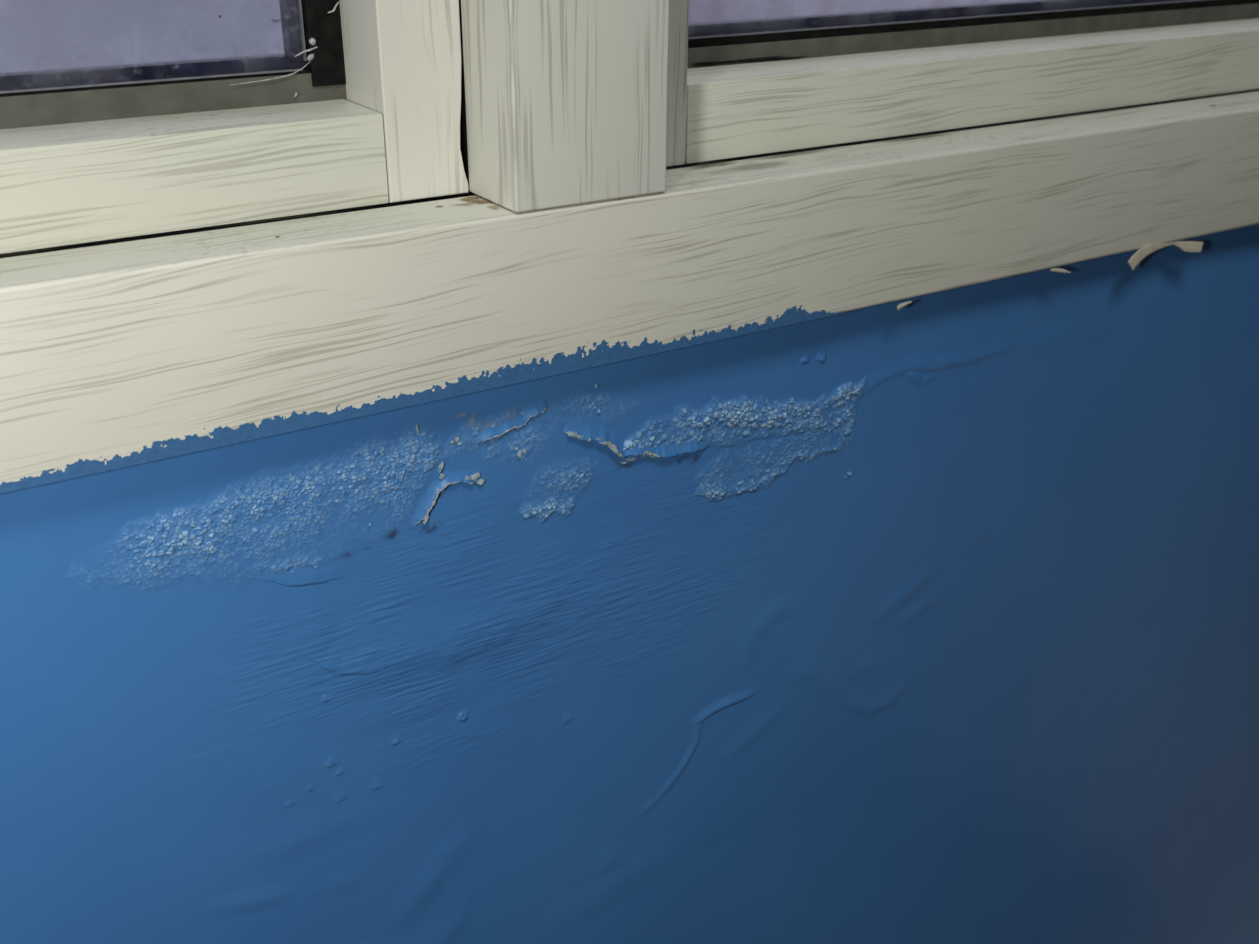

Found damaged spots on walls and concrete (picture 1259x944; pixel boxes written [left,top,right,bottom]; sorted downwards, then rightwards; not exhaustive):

peeling [476,395,548,458]
peeling [564,405,710,464]
peeling [410,461,485,526]